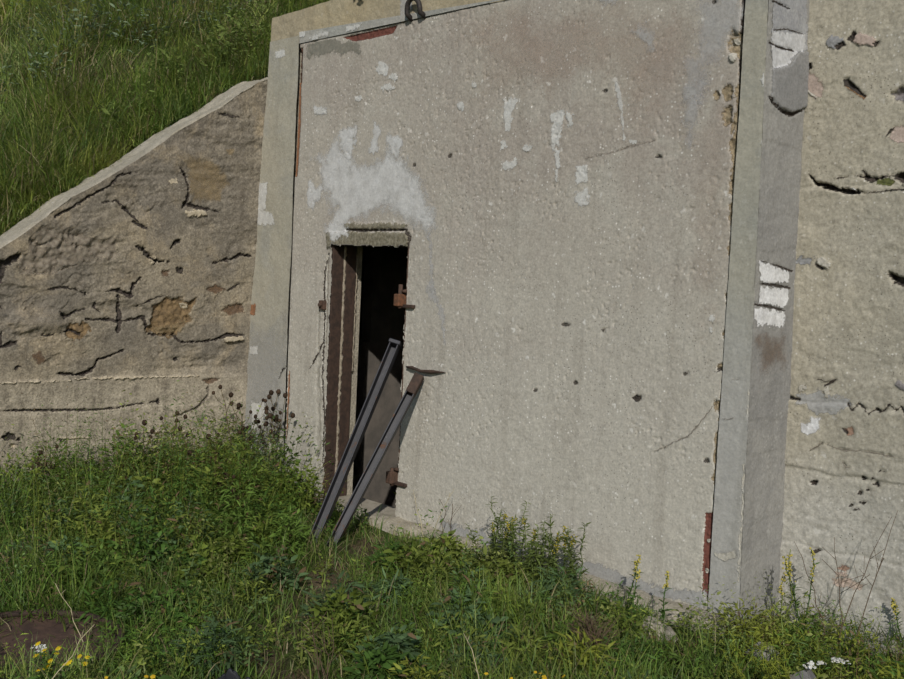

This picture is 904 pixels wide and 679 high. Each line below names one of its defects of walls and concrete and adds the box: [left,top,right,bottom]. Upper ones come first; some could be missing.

corrosion [343,25,397,41]
peeling [760,31,806,86]
spalling [826,31,879,50]
spalling [843,79,866,99]
crack [54,172,139,222]
crack [180,167,218,217]
crack [810,170,904,194]
spalling [0,227,122,283]
damp [307,122,446,345]
crack [42,277,243,376]
crack [4,378,218,418]
corrosion [702,512,713,597]